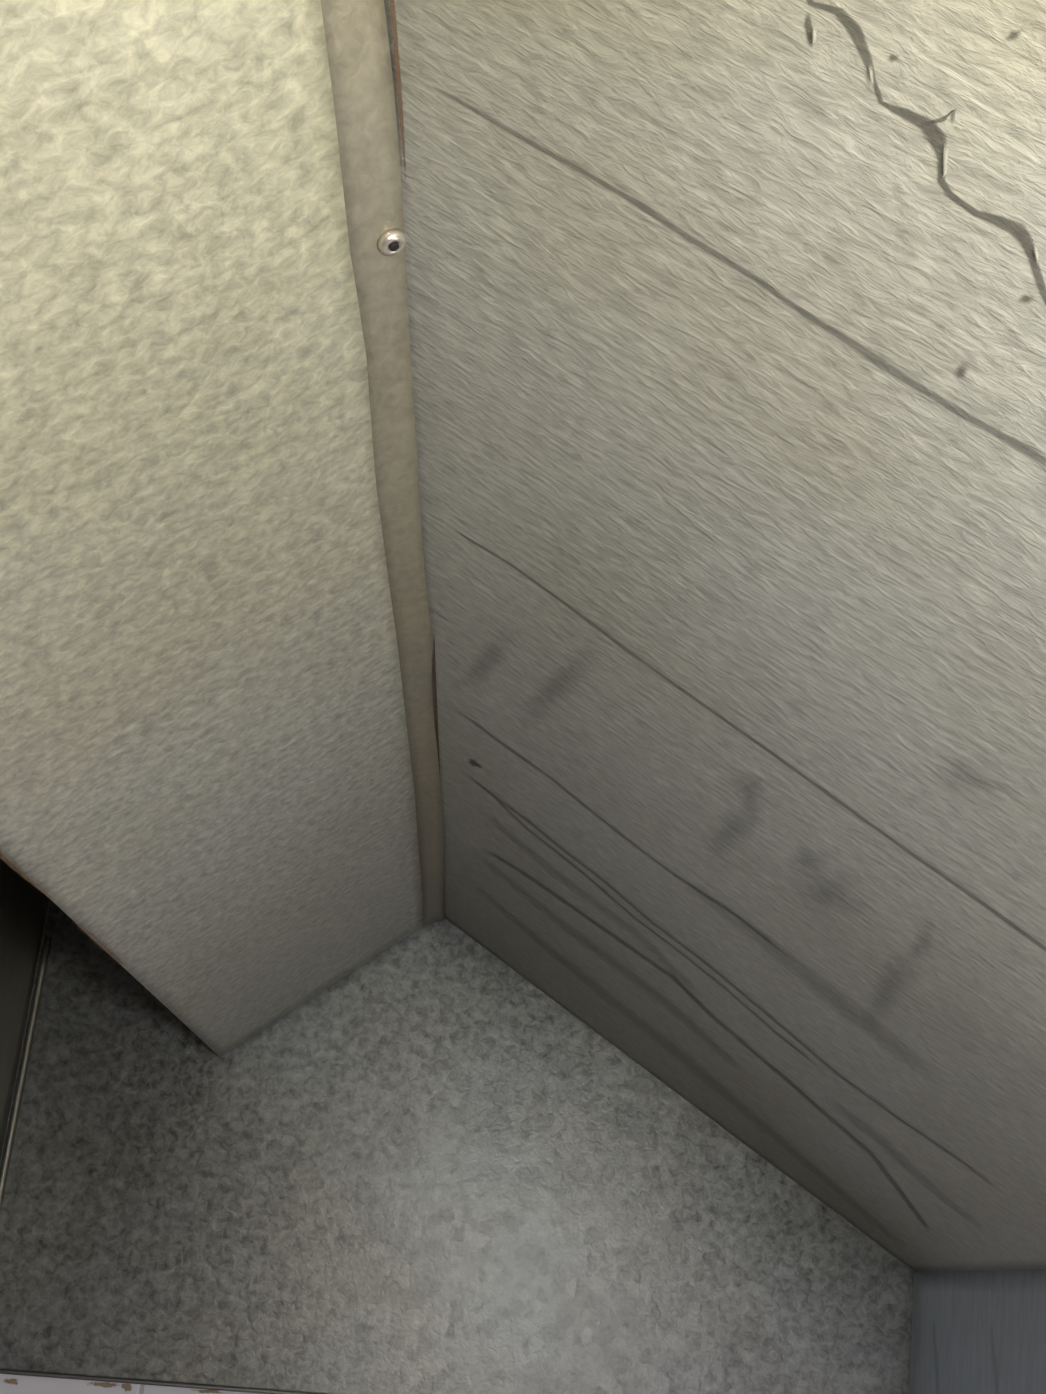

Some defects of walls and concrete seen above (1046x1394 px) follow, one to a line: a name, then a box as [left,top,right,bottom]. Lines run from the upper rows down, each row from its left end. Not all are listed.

crack [806,0,1046,302]